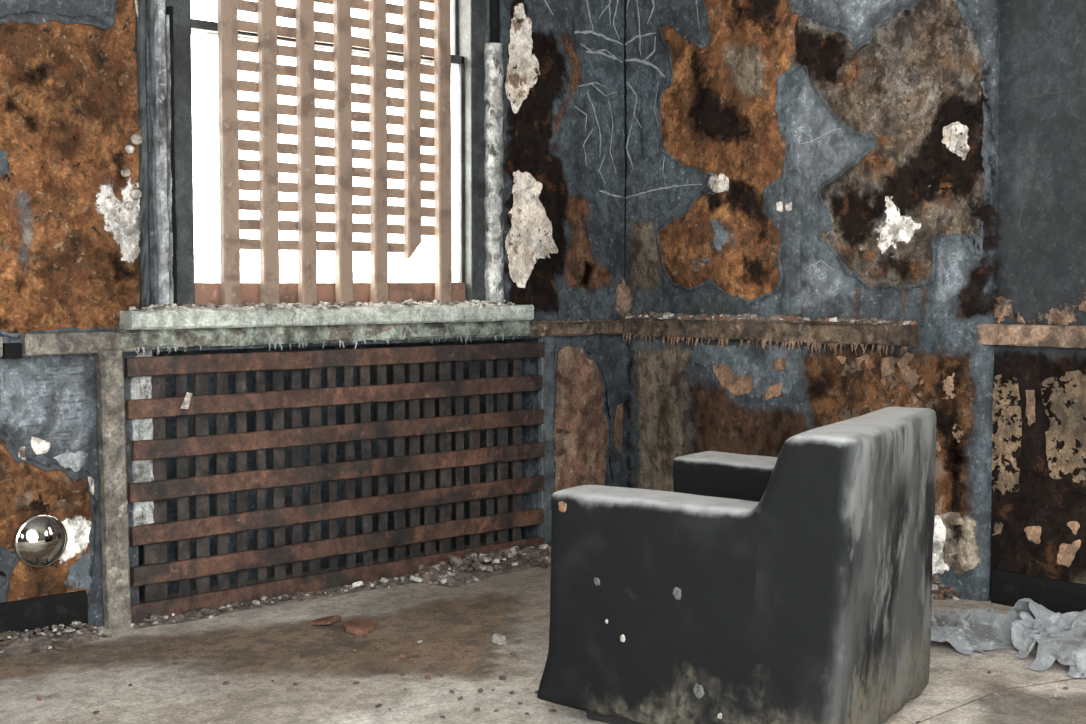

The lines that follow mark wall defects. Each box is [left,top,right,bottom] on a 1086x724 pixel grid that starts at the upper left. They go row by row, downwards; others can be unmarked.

spalling [505,3,540,114]
spalling [0,0,153,339]
crack [574,0,702,279]
spalling [655,0,995,304]
spalling [505,170,558,288]
peeling [836,352,924,408]
peeling [942,372,956,400]
peeling [991,370,1086,495]
spalling [0,430,98,603]
peeling [1024,526,1041,544]
peeling [1057,521,1081,567]